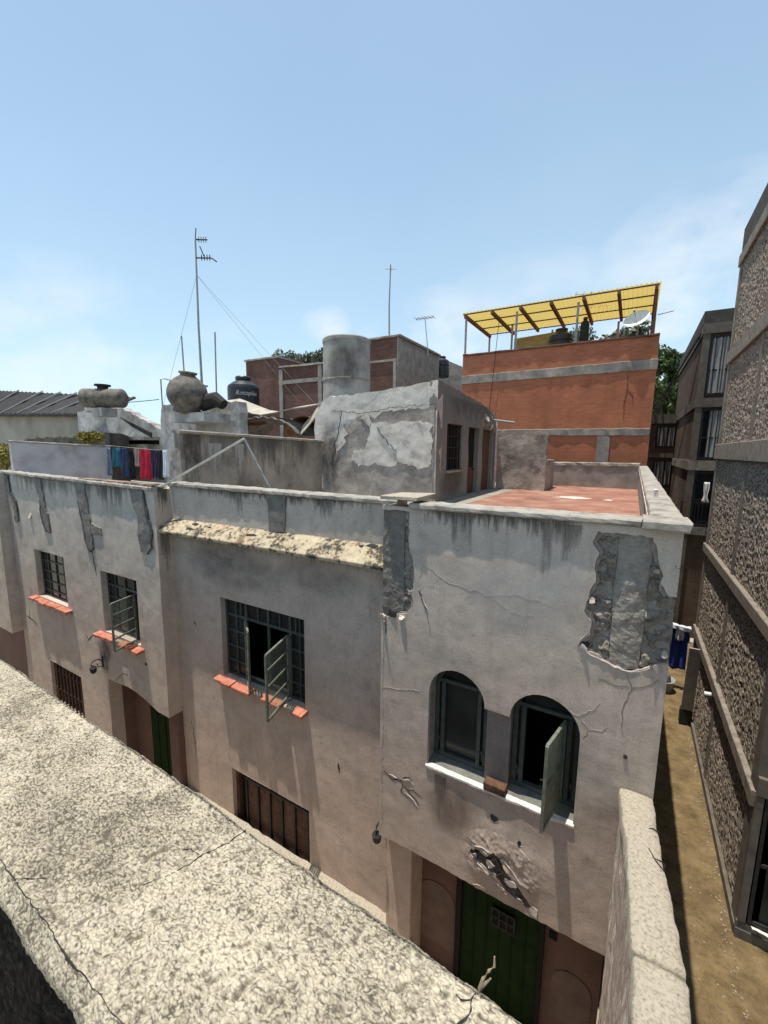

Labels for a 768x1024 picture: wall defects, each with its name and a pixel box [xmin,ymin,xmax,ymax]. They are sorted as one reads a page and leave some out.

peeling [331,405,435,501]
leakage [437,511,569,529]
spalling [359,510,414,634]
spalling [577,531,676,673]
crack [381,634,421,827]
crack [570,674,657,737]
crack [143,829,246,886]
spalling [472,844,538,918]
crack [0,859,123,1024]